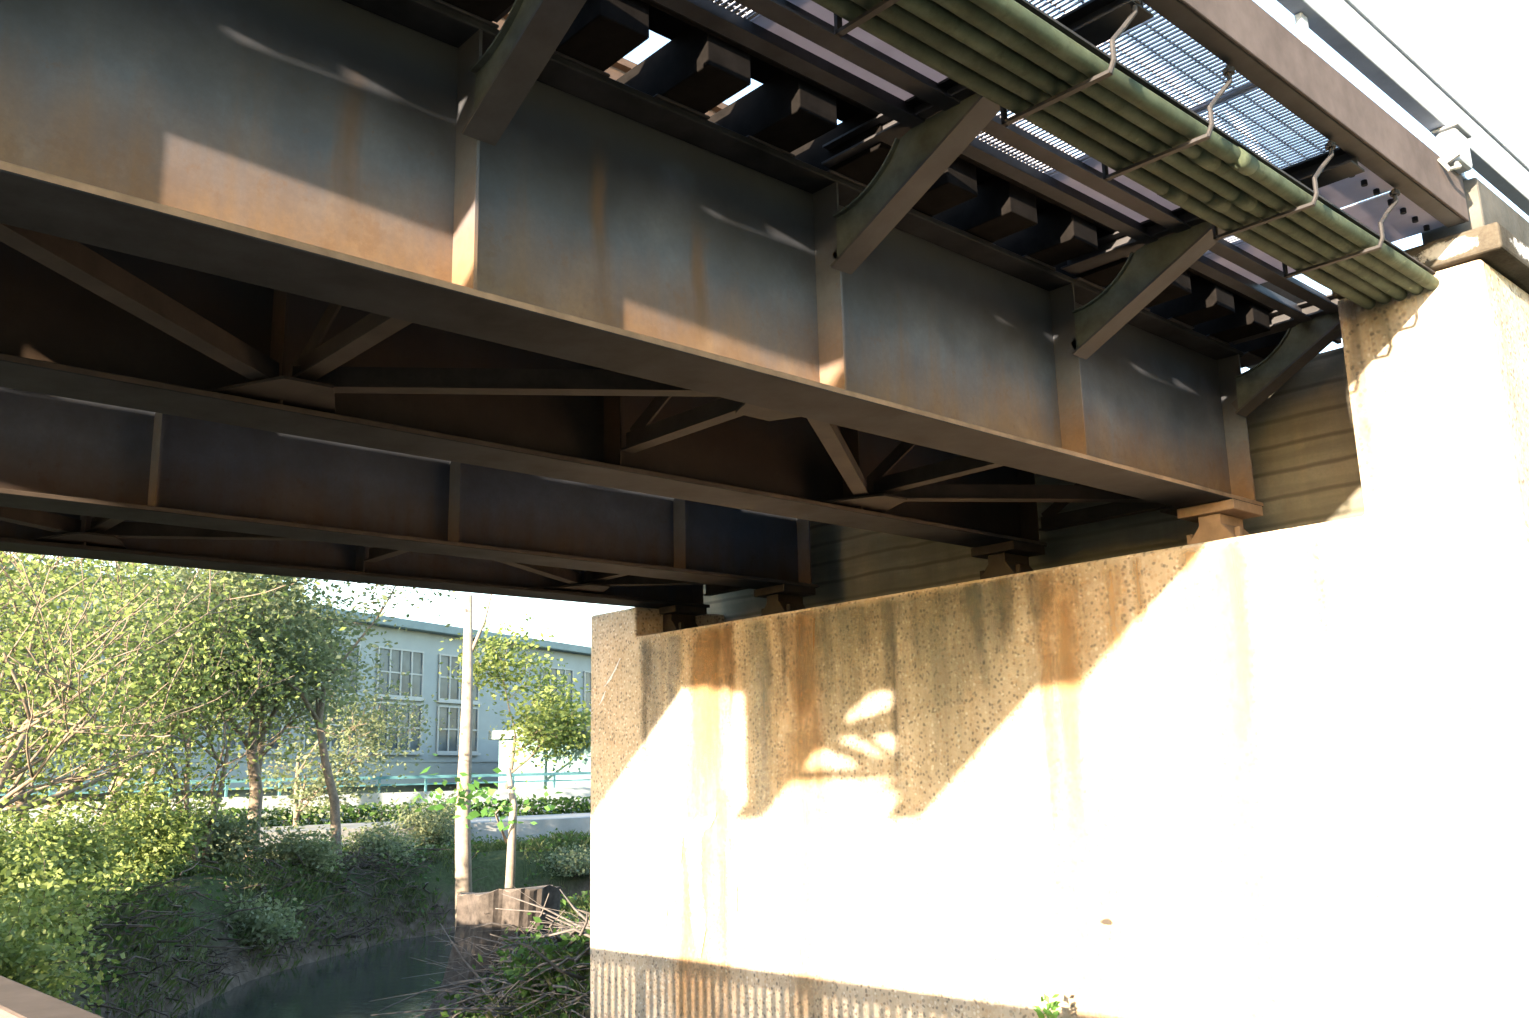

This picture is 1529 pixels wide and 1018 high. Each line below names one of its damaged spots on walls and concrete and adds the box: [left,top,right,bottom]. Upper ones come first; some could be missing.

corrosion [693,627,733,765]
corrosion [782,616,820,772]
corrosion [681,797,726,992]